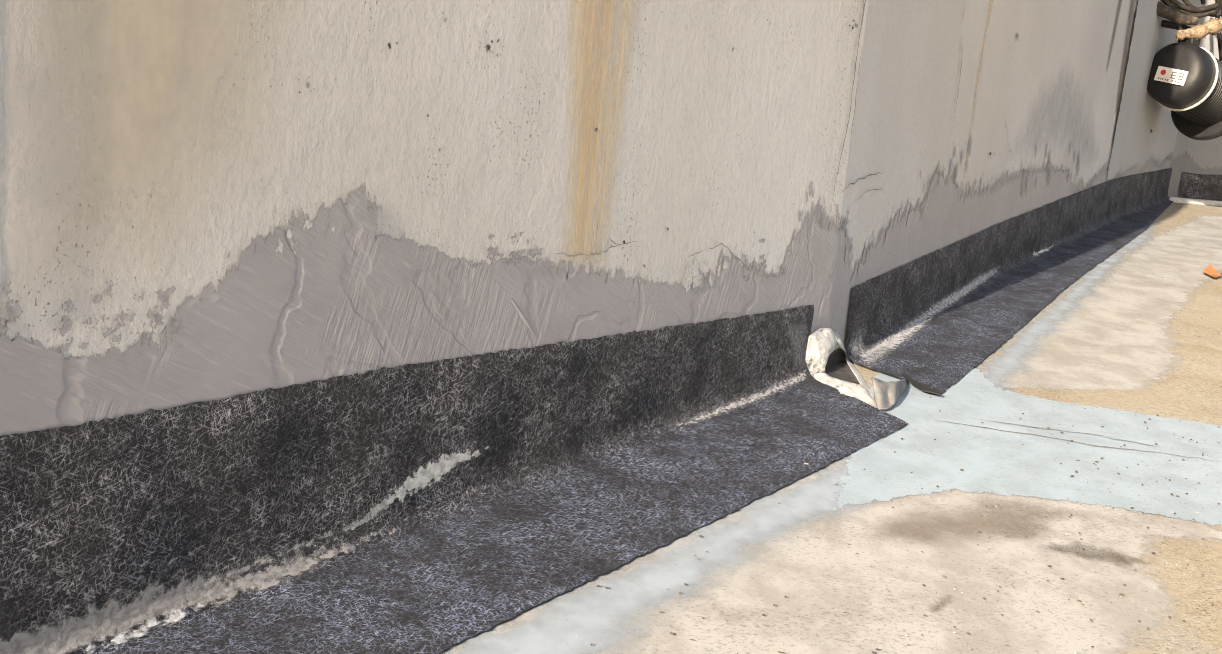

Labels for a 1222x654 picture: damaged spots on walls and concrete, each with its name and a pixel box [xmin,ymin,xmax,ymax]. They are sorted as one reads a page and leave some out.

crack [830,0,884,216]